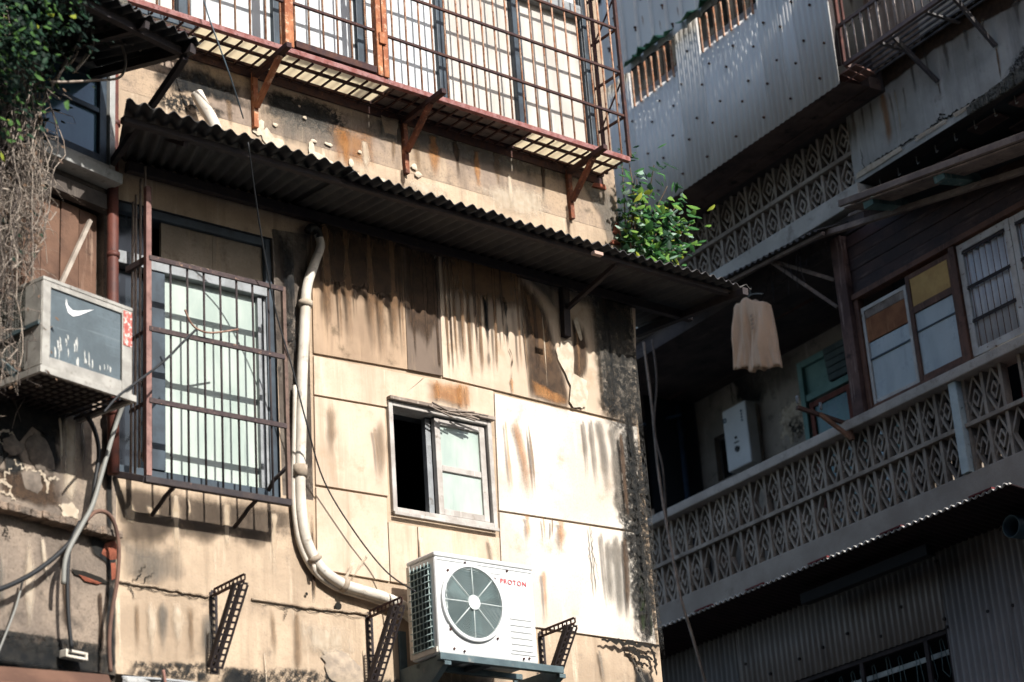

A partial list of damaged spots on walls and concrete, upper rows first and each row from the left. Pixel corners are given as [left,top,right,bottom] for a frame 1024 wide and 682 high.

mould [157,68,241,118]
water stain [265,93,349,141]
peeling [521,280,588,408]
rust [434,380,469,404]
peeling [0,459,60,501]
water stain [316,222,663,643]
rust [505,423,535,482]
water stain [106,466,284,580]
water stain [26,540,47,605]
water stain [132,661,209,681]
water stain [136,605,213,649]
water stain [223,614,333,682]